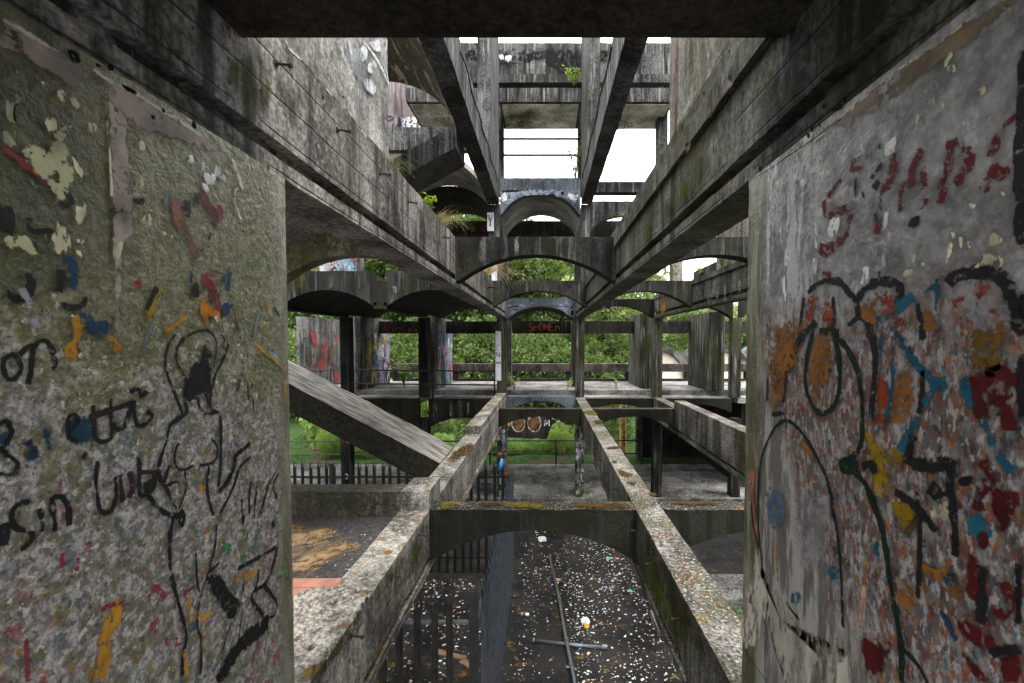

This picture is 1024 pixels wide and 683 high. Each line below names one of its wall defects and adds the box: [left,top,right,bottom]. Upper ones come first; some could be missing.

water stain [499,48,582,74]
water stain [672,38,712,134]
flaking render [807,0,1016,138]
flaking render [0,18,244,337]
peeling [946,232,970,263]
peeling [975,233,1004,268]